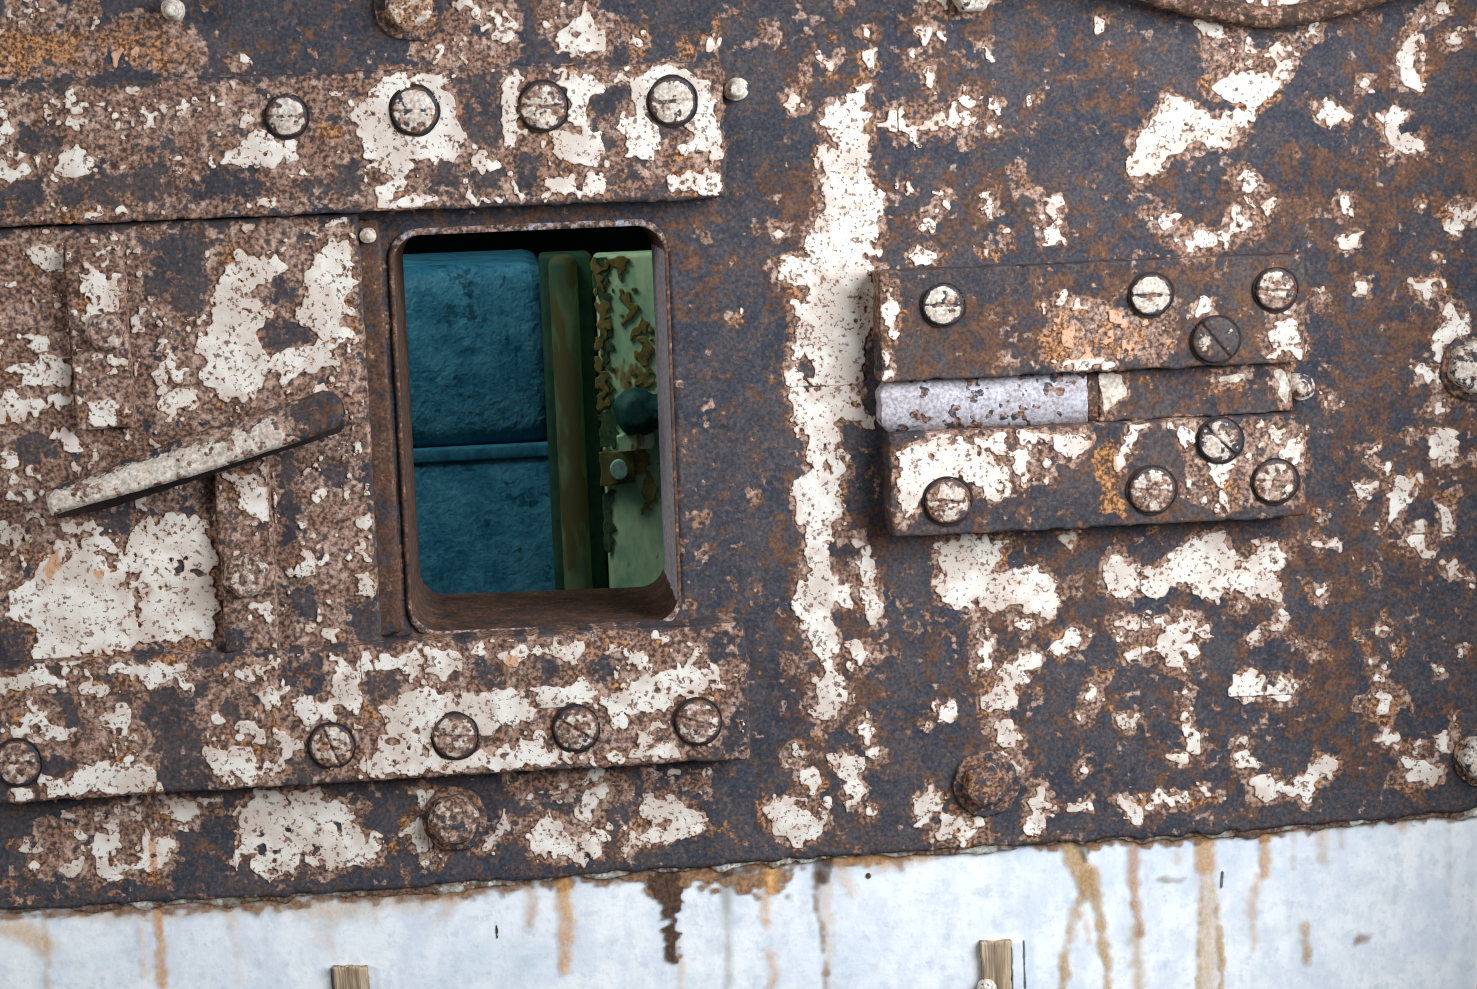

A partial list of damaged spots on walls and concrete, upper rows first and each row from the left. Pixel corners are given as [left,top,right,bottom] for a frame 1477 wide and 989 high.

peeling [329,0,724,209]
peeling [0,197,376,624]
corrosion [591,256,655,416]
corrosion [633,449,661,514]
peeling [762,26,1001,848]
peeling [895,429,1092,518]
peeling [0,451,741,883]
peeling [930,530,1092,776]
peeling [1102,419,1310,769]
corrosion [0,854,933,988]
corrosion [1031,835,1238,989]
corrosion [1260,827,1314,876]